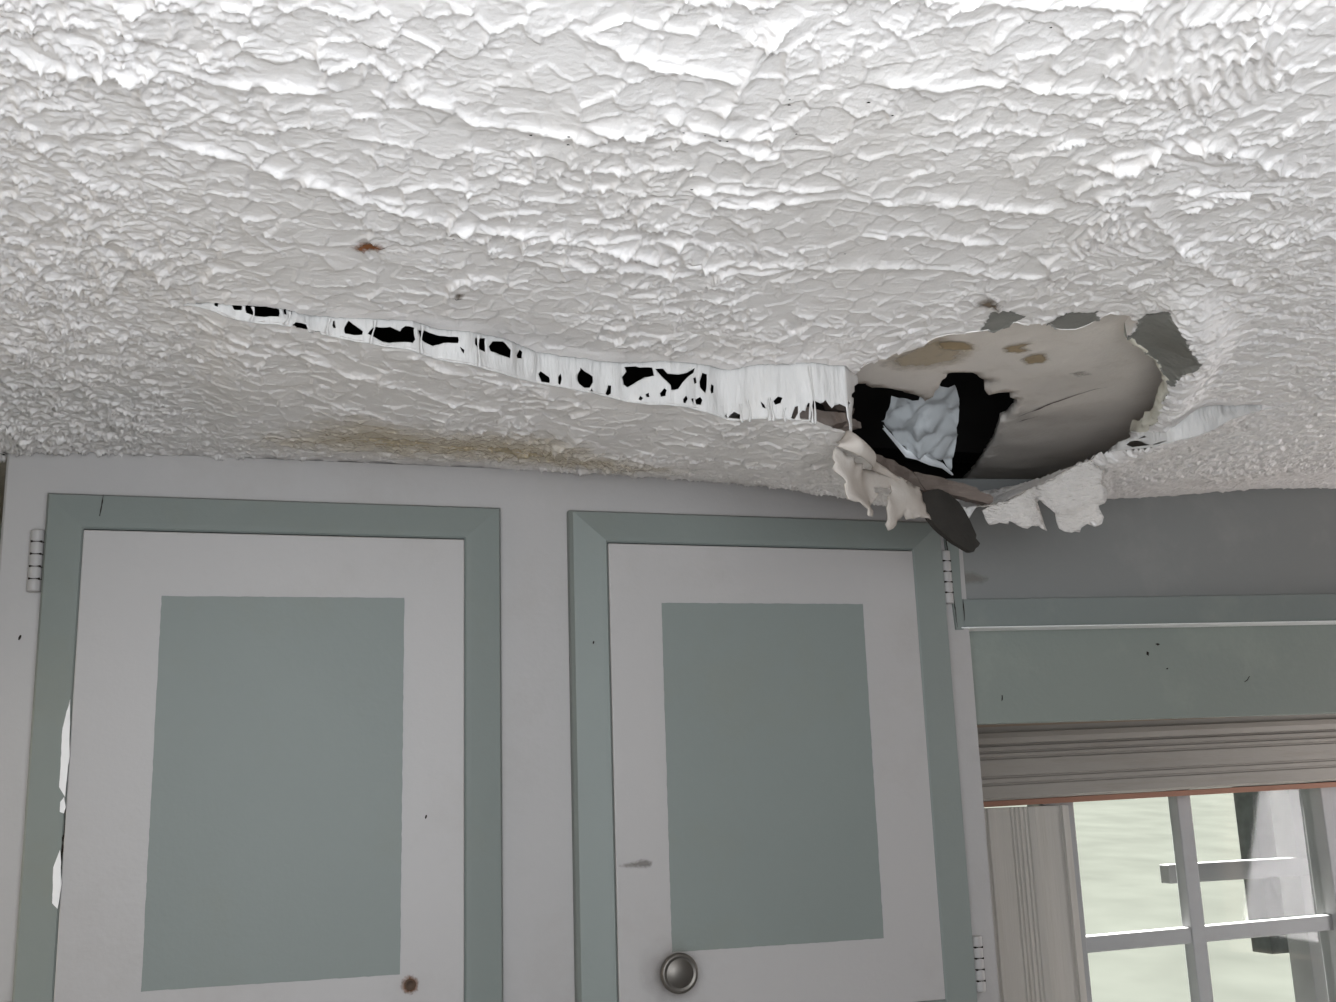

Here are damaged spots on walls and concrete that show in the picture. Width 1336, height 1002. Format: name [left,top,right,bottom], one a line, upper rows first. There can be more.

peeling [980,311,1026,333]
peeling [1046,311,1101,330]
leakage [897,341,972,366]
leakage [1005,344,1046,364]
peeling [1127,311,1203,387]